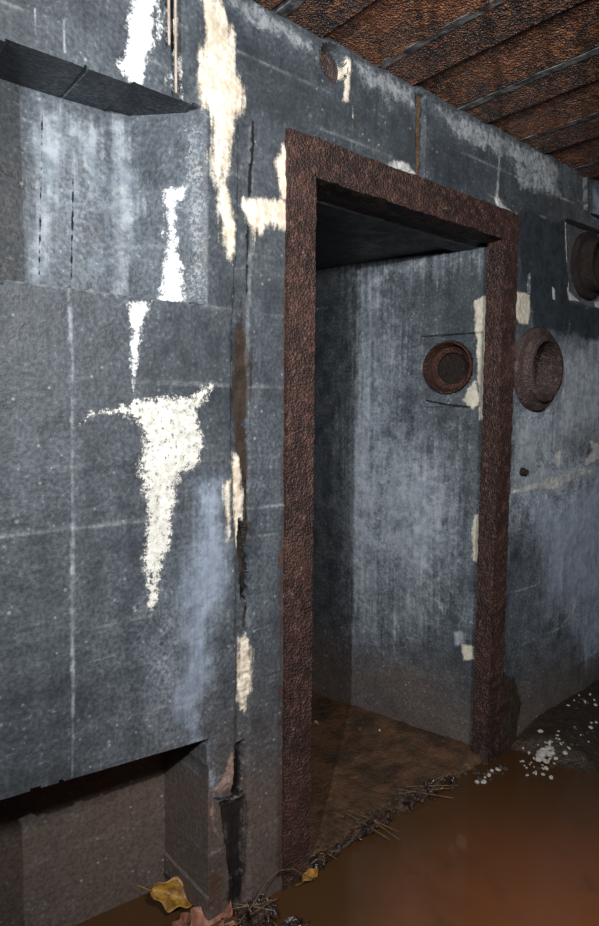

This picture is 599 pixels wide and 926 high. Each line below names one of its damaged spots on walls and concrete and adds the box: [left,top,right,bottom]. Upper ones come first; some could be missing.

leakage [85,0,286,615]
peeling [511,440,599,493]